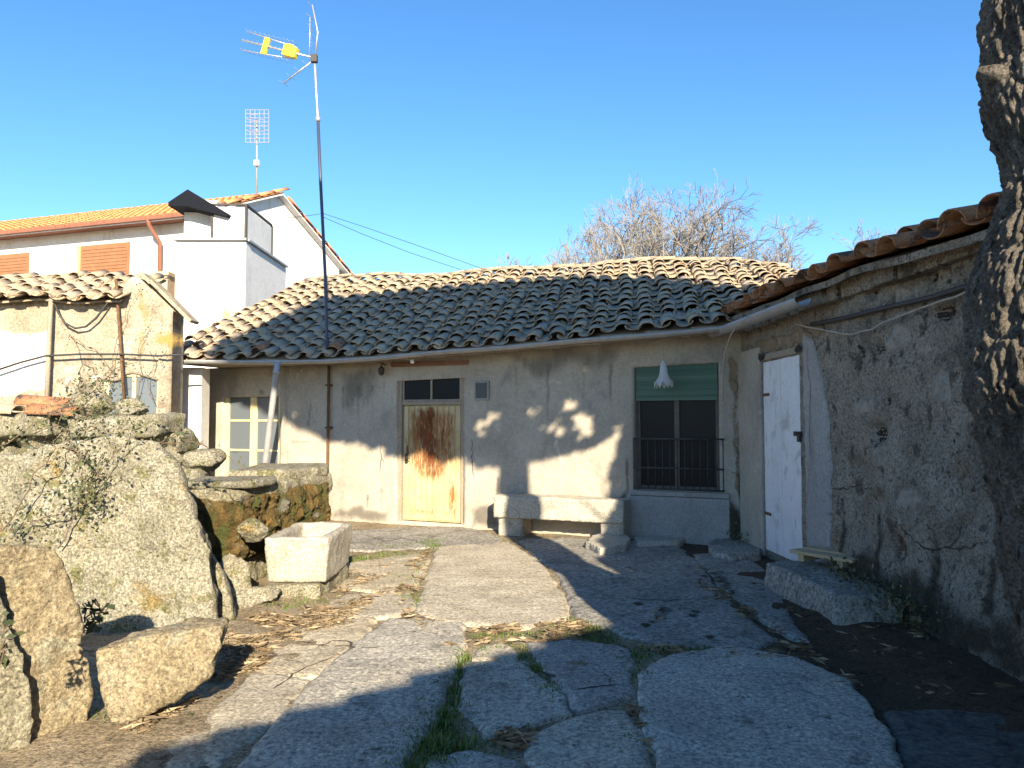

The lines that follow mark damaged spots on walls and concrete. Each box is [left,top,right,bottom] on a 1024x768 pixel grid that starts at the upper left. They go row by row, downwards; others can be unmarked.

rust [406,407,453,477]
crack [892,512,985,583]